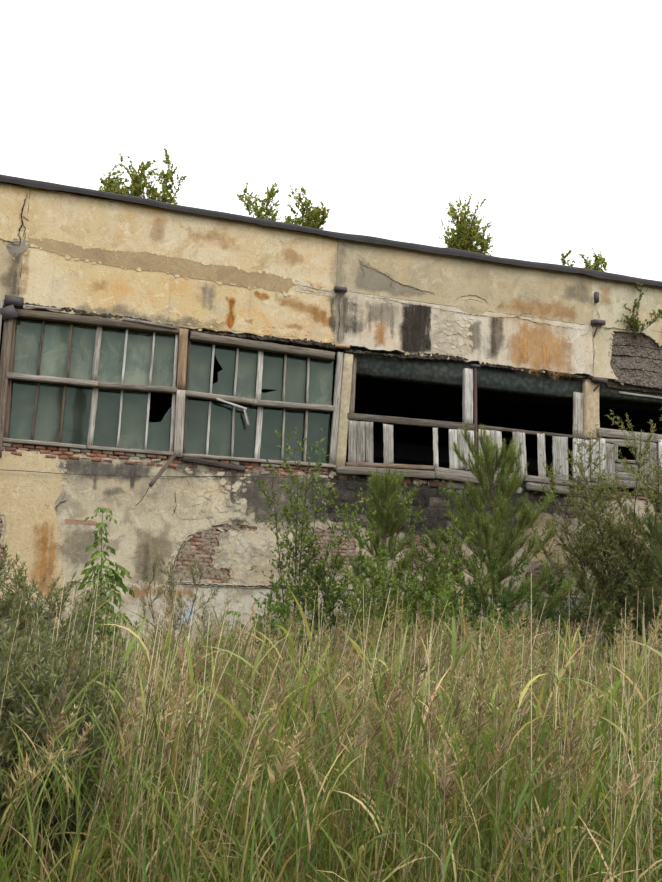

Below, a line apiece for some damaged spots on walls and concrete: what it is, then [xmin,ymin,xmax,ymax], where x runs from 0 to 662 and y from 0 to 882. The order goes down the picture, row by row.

crack [0,194,29,248]
peeling [6,237,336,297]
rust [226,298,235,327]
water stain [356,262,431,354]
crack [300,261,660,374]
water stain [470,318,502,358]
rust [499,300,575,373]
spalling [607,332,662,393]
spalling [162,467,596,634]